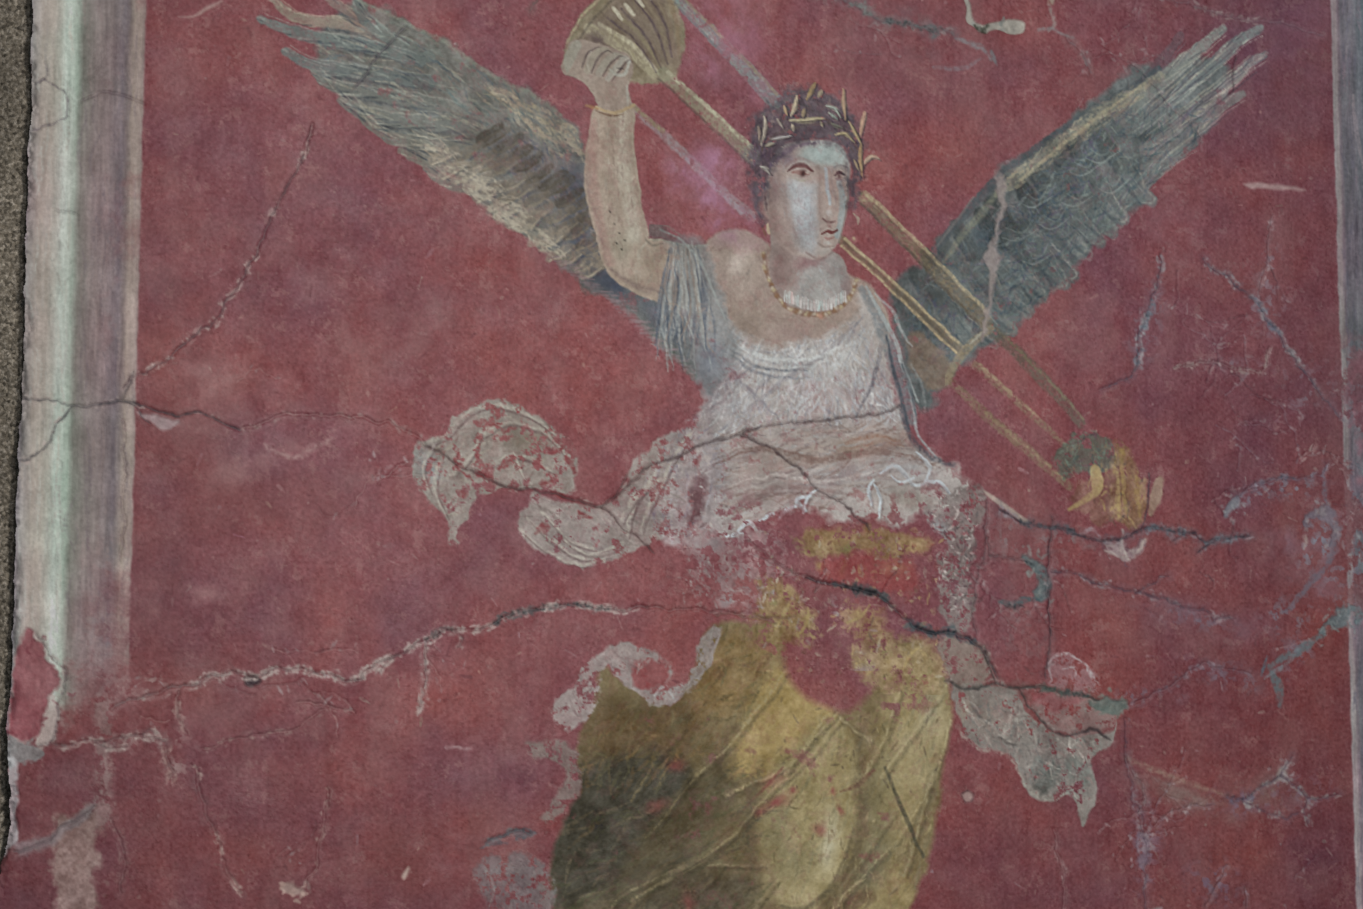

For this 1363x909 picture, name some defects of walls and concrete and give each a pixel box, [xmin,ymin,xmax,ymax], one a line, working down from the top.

crack [831,0,962,45]
spalling [931,0,1026,73]
crack [17,117,323,562]
peeling [6,625,77,746]